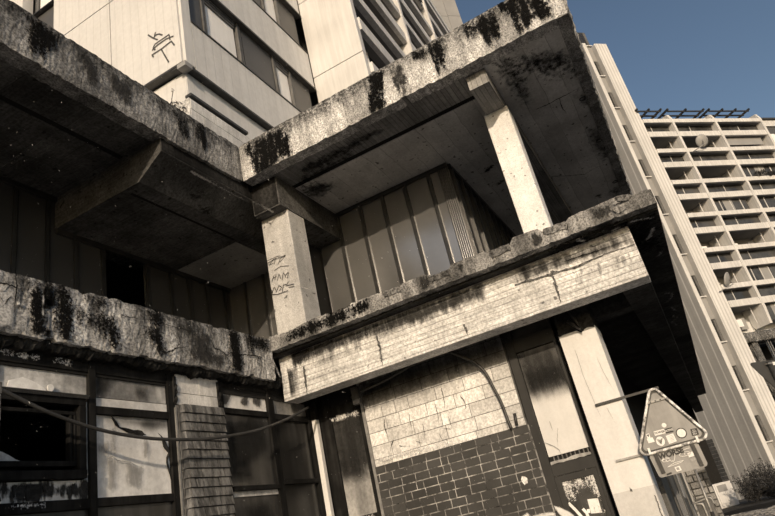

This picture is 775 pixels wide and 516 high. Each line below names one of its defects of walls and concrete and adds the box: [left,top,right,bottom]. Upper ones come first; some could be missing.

water stain [22,13,61,61]
water stain [83,54,132,106]
water stain [367,64,411,113]
water stain [411,39,446,74]
water stain [463,0,553,48]
water stain [174,112,211,151]
water stain [243,128,295,174]
water stain [26,277,123,350]
water stain [142,309,166,357]
crack [157,324,267,365]
water stain [182,322,274,372]
water stain [278,284,483,395]